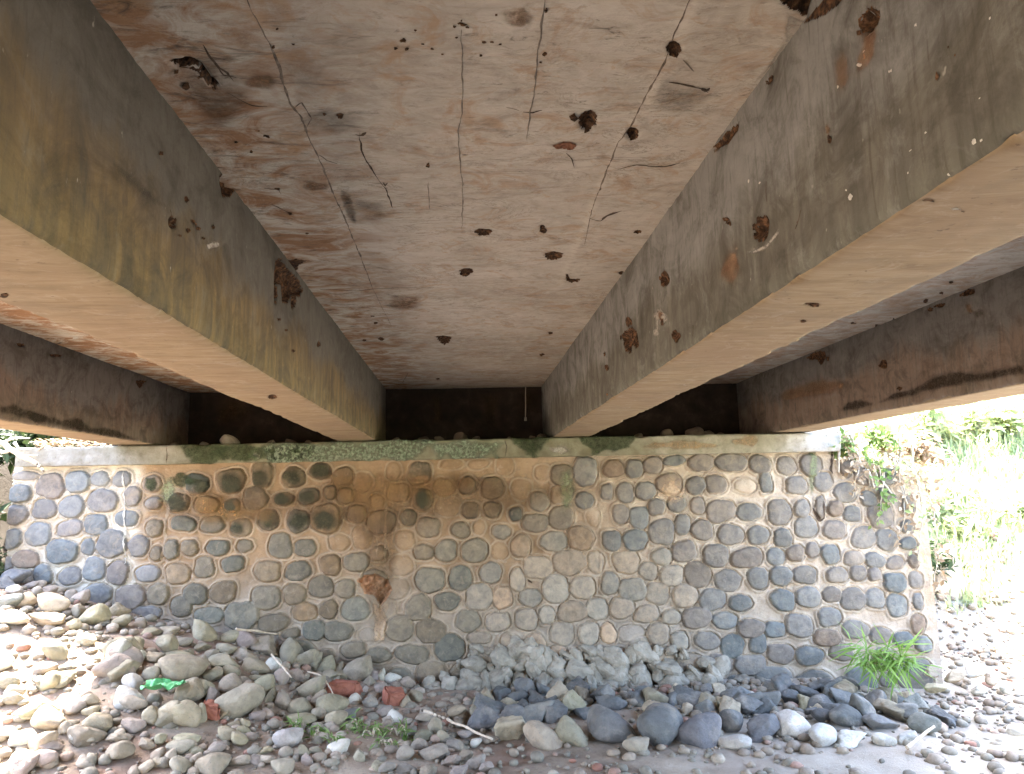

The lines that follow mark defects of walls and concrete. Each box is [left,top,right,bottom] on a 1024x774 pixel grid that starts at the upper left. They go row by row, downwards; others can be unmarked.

spalling [856,6,880,35]
spalling [170,56,219,91]
crack [506,1,545,134]
crack [670,60,710,93]
crack [456,30,464,228]
spalling [569,110,597,133]
crack [355,132,393,208]
spalling [274,258,307,309]
damp [886,366,1024,400]
damp [1,404,129,439]
damp [844,400,869,410]
damp [157,486,263,562]